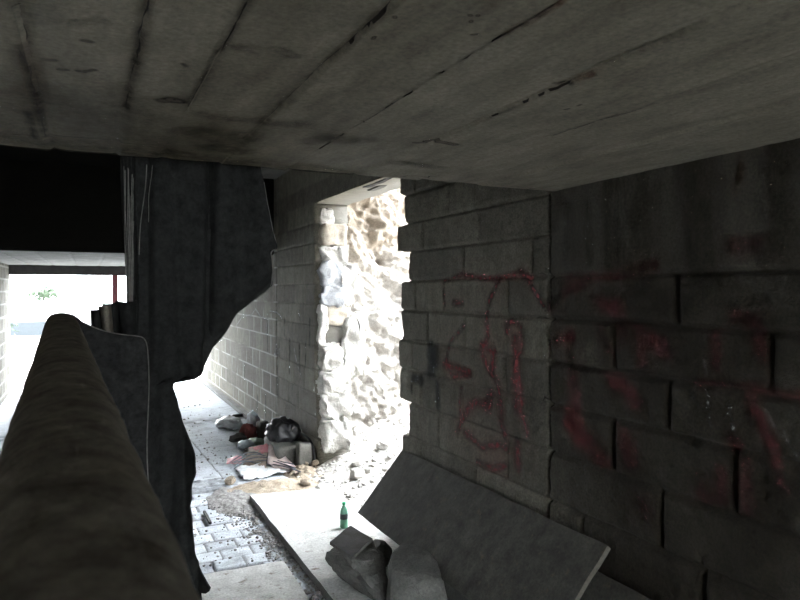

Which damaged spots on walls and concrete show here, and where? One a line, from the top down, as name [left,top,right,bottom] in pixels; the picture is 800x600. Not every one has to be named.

crack [522,81,571,103]
spalling [313,208,367,453]